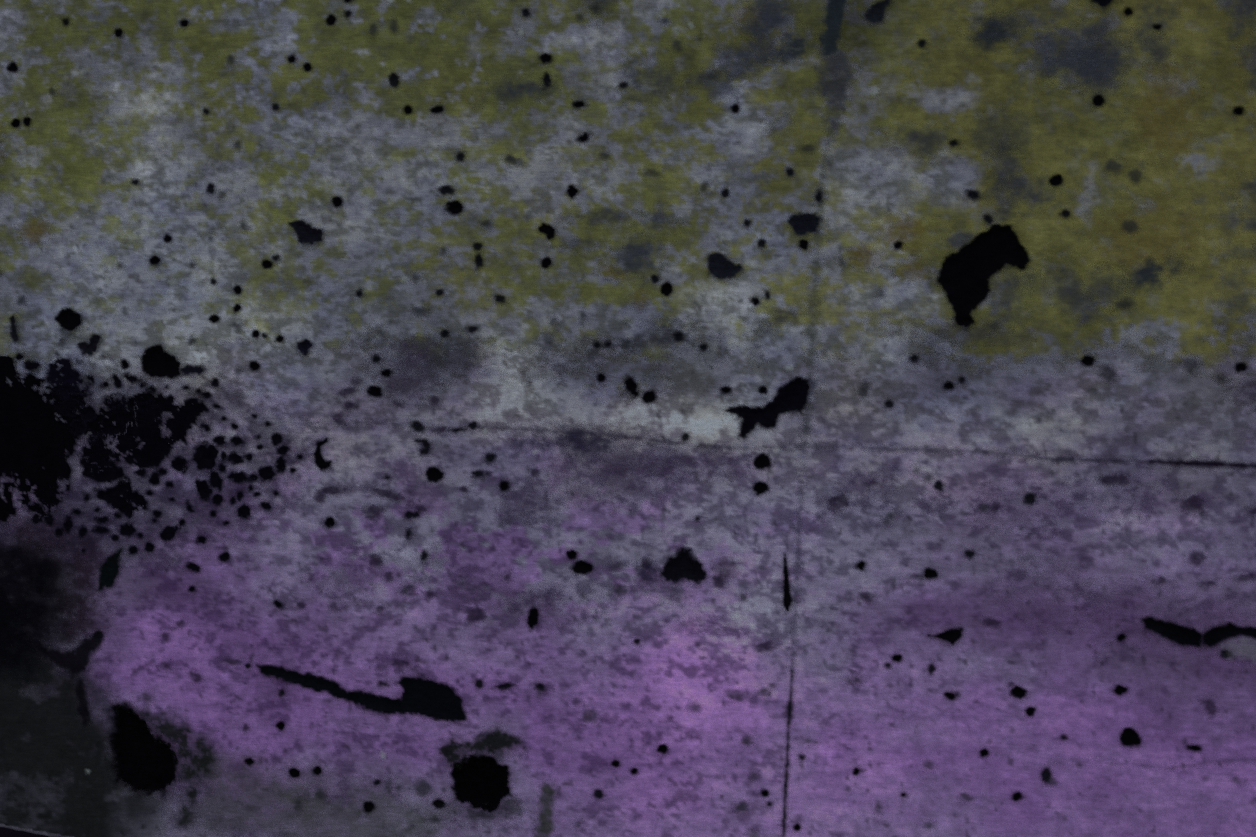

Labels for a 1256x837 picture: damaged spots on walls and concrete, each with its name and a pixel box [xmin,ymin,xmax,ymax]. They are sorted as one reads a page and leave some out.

leakage [0,0,1256,373]
hole [140,343,207,379]
crack [477,199,839,449]
hole [724,376,818,439]
crack [870,444,939,452]
hole [936,224,1031,329]
crack [974,450,1256,469]
leakage [0,296,1256,837]
hole [634,547,707,598]
hole [107,702,217,827]
hole [222,658,526,822]
crack [781,654,794,837]